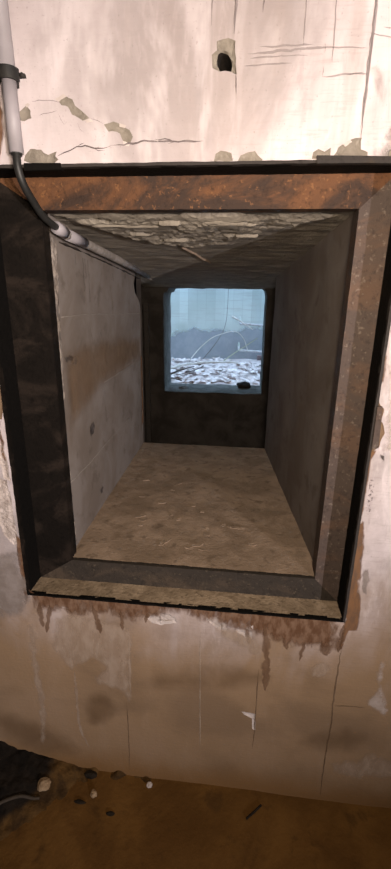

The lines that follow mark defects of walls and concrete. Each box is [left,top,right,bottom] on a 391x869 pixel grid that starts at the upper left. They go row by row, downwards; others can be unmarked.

spalling [212,38,237,75]
peeling [20,103,31,121]
peeling [56,94,93,123]
peeling [104,122,133,146]
spalling [24,149,58,163]
crack [58,138,200,156]
spalling [312,138,368,159]
rust [16,451,376,691]